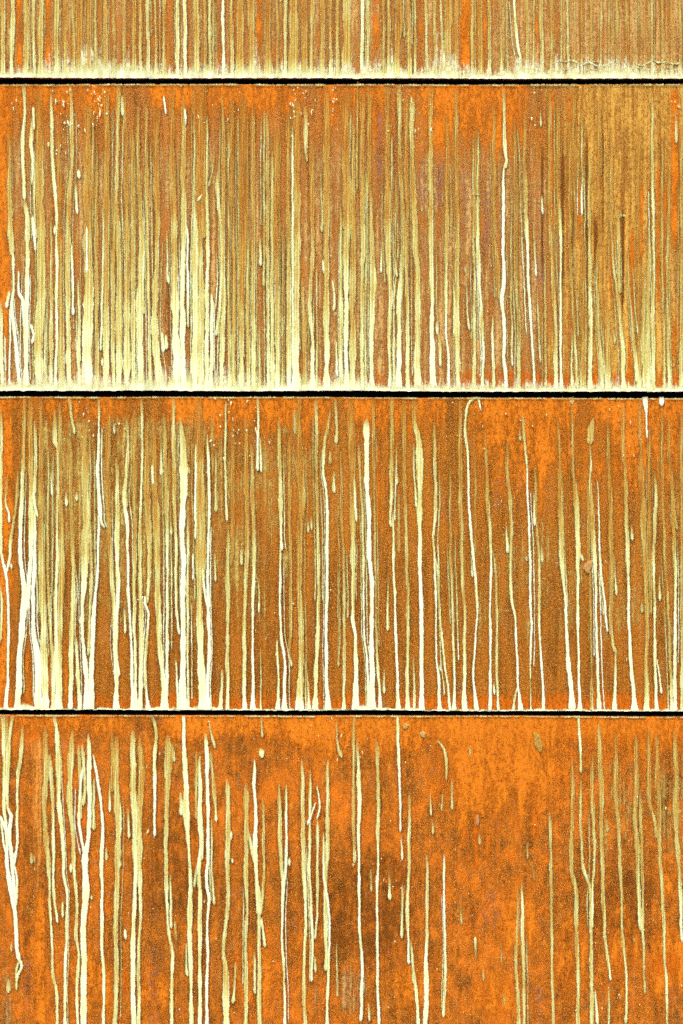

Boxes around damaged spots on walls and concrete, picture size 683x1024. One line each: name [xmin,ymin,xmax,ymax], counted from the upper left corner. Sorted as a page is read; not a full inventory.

damp [0,85,683,711]
rust [0,85,683,870]
damp [0,401,429,1024]
damp [430,742,453,834]
rust [69,949,169,1015]
rust [229,941,274,1008]
rust [381,958,434,1014]
damp [503,887,529,1024]
rust [496,881,537,952]
rust [550,915,588,1006]
damp [548,718,683,1024]
rust [607,903,683,1003]